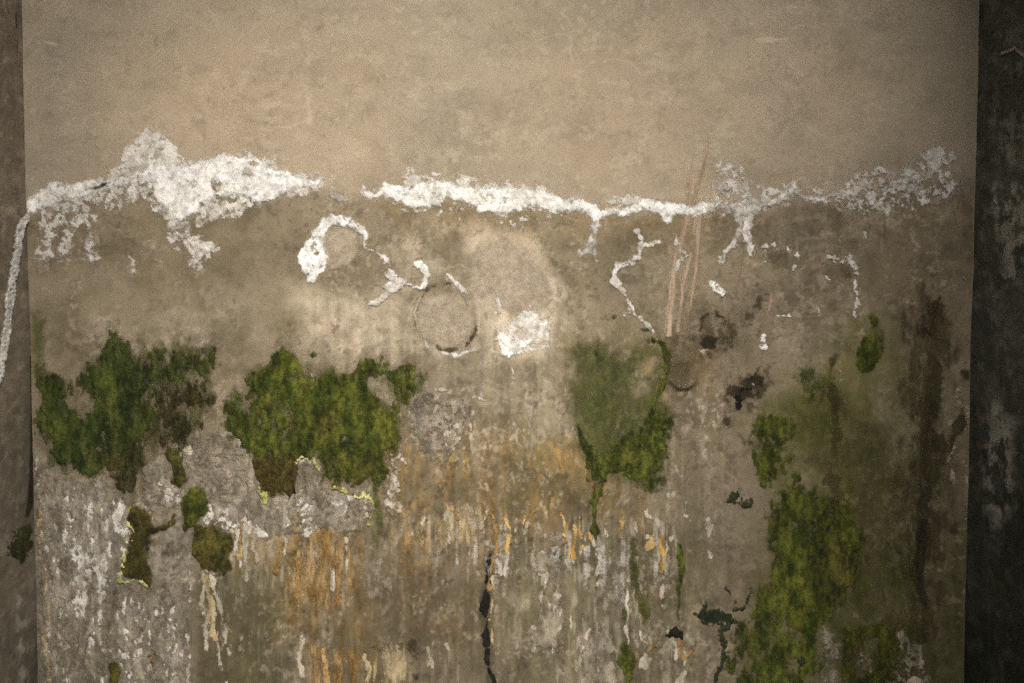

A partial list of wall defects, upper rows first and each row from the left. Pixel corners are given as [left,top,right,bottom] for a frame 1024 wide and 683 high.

leakage [0,127,347,384]
efflorescence [298,214,430,306]
leakage [361,146,957,337]
efflorescence [496,297,551,380]
leakage [724,369,771,425]
flaking render [34,430,407,683]
rust [272,527,354,611]
rust [442,503,529,591]
rust [555,507,624,563]
rust [199,572,231,683]
rust [297,635,407,683]
crack [479,553,497,683]